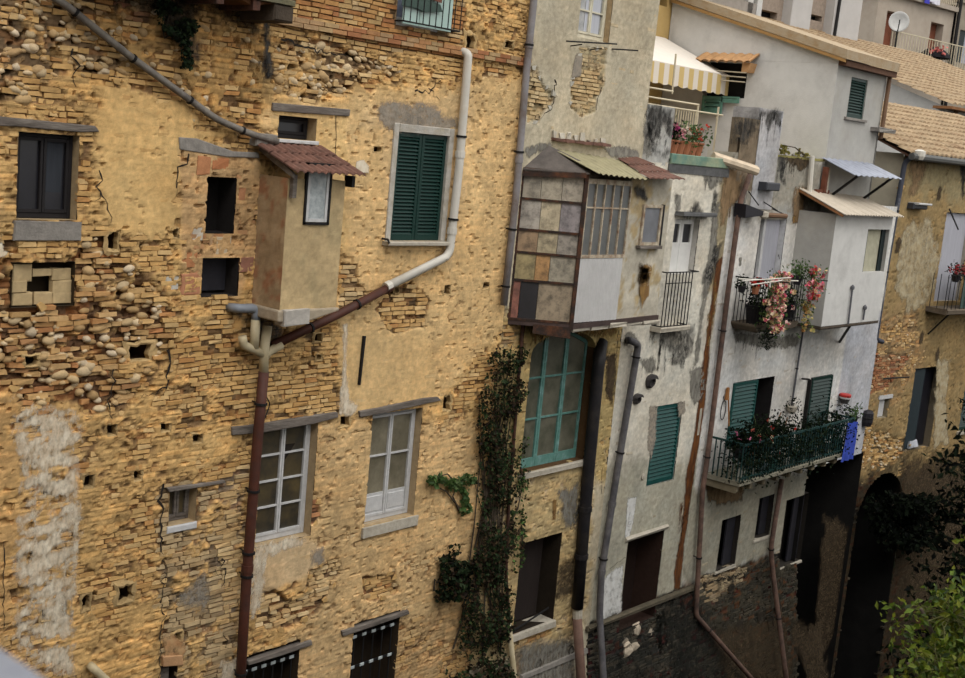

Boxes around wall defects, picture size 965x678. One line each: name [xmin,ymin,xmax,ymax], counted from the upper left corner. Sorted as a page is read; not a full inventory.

flaking render [527,65,556,124]
flaking render [569,45,608,116]
spalling [376,281,430,332]
water stain [578,167,747,417]
rust [674,257,723,590]
efflorescence [12,406,81,675]
crack [157,484,168,678]